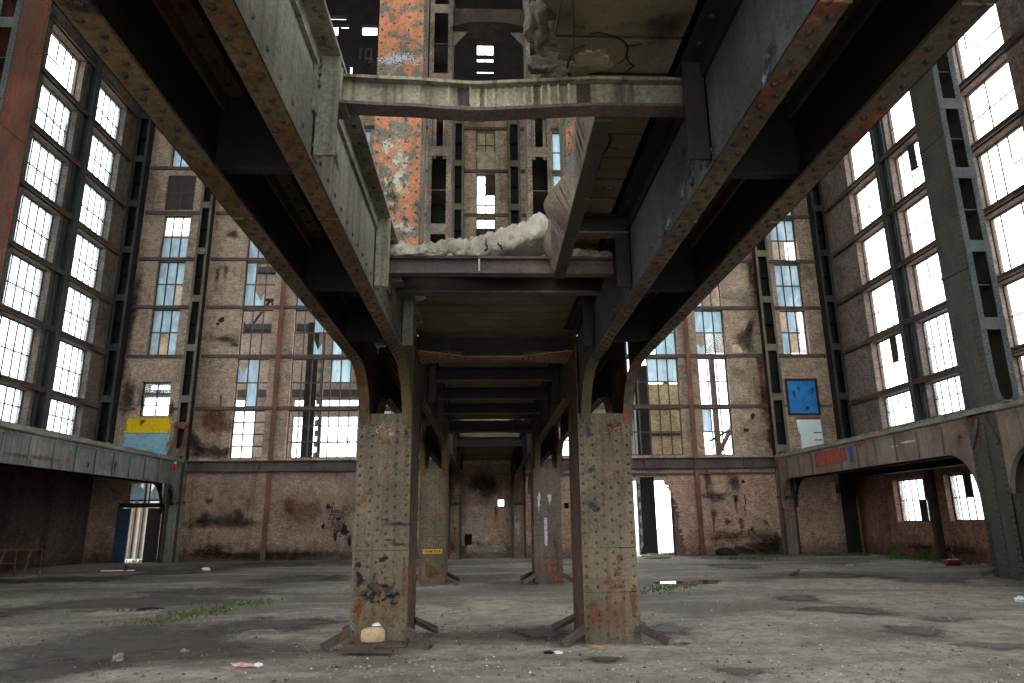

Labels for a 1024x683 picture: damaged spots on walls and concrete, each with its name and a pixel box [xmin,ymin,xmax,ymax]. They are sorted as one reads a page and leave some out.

spalling [523,0,613,78]
crack [590,32,642,75]
water stain [729,477,746,528]
peeling [355,556,405,605]